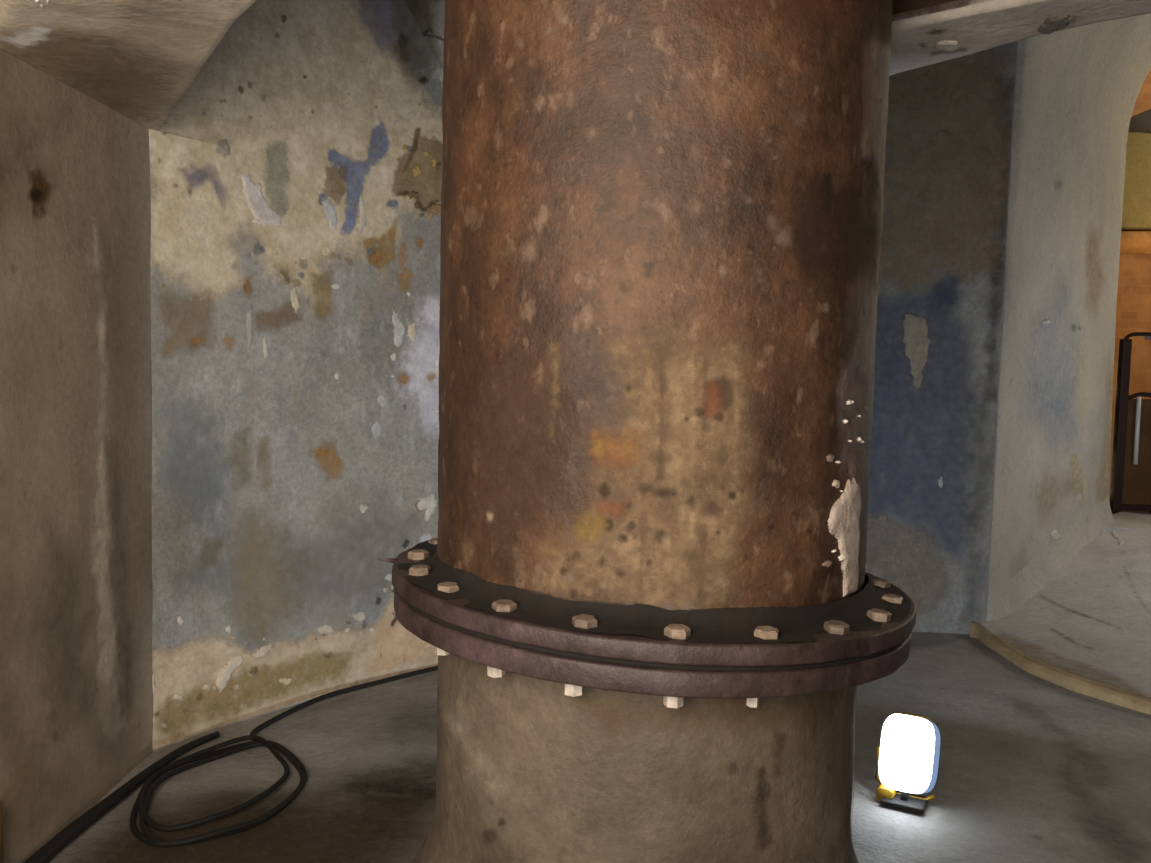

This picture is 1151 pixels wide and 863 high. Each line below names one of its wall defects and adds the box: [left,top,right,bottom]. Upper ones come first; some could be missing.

peeling [149,0,443,361]
peeling [902,313,931,389]
flaking render [416,494,437,542]
peeling [826,437,864,464]
flaking render [822,477,944,613]
flaking render [152,574,438,750]